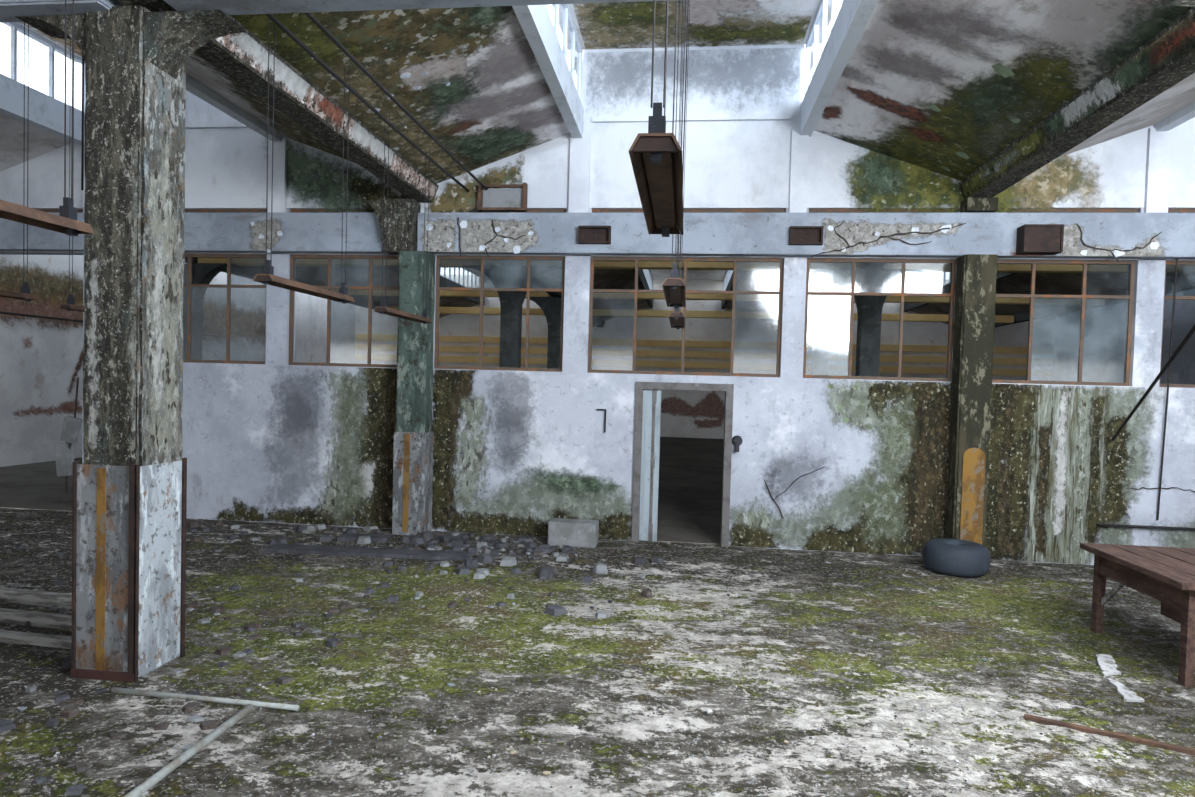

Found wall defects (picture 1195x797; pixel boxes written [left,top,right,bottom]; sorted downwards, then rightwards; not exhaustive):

water stain [192,53,408,213]
water stain [231,6,564,213]
water stain [833,4,1099,213]
peeling [422,219,539,254]
peeling [822,218,962,254]